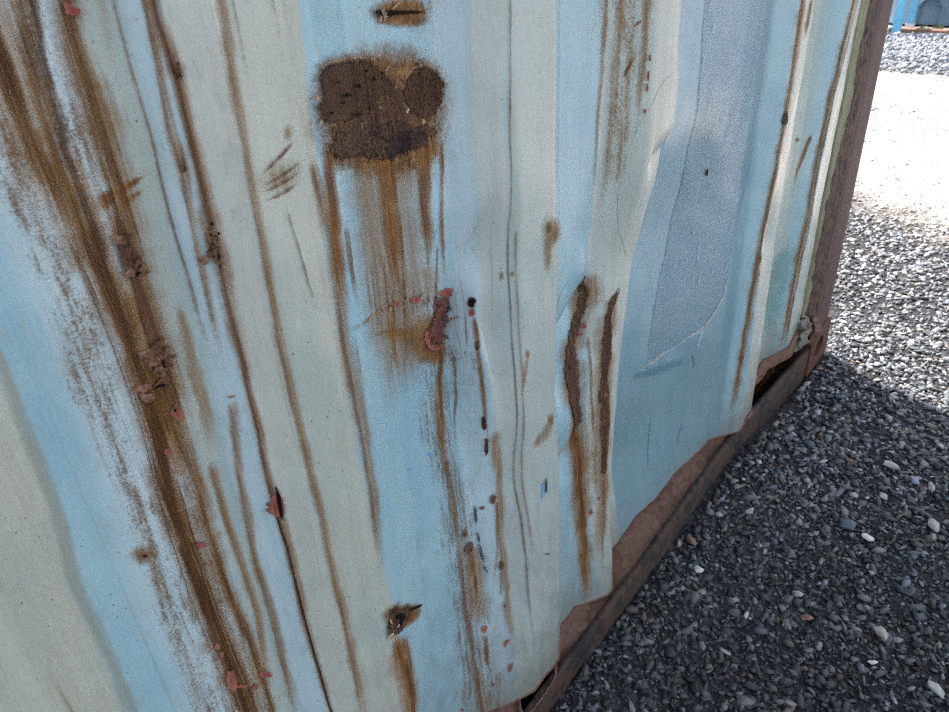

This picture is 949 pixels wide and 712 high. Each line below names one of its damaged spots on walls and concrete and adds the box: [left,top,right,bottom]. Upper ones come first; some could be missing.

peeling [112,234,149,279]
rust [0,0,289,712]
peeling [131,337,177,403]
peeling [266,487,284,519]
rust [264,263,362,712]
peeling [357,288,460,363]
rust [414,345,511,712]
rust [485,0,531,608]
rust [563,275,620,584]
rust [594,0,650,179]
rust [735,0,813,393]
rust [785,0,858,334]